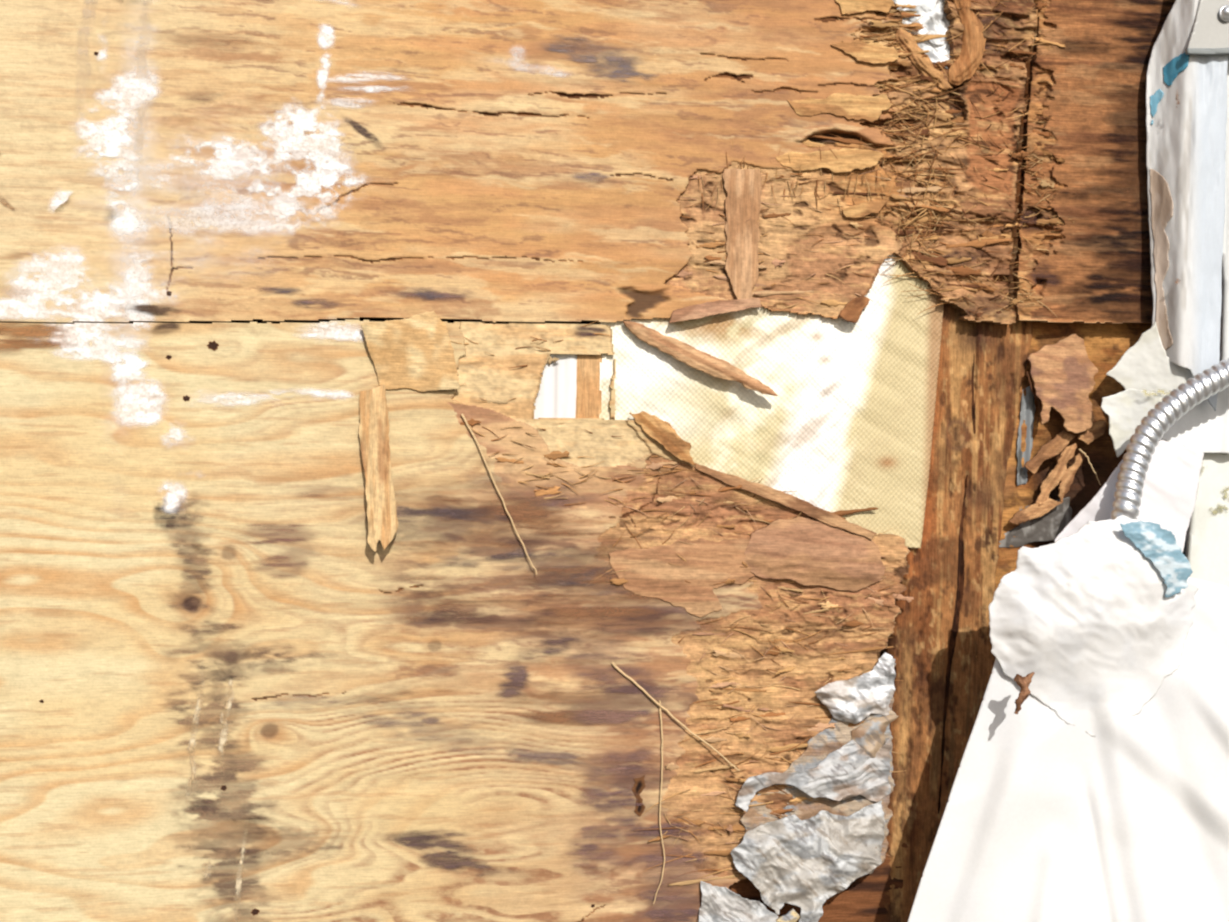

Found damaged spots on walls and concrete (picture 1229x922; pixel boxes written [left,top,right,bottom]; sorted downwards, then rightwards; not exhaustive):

leakage [77,73,157,238]
leakage [174,25,399,232]
crack [394,91,667,119]
peeling [665,126,1074,318]
peeling [851,4,951,87]
leakage [1076,0,1174,323]
leakage [0,251,178,425]
peeling [448,321,677,511]
peeling [832,507,878,519]
leakage [396,496,689,724]
leakage [172,650,295,915]
peeling [698,682,865,752]